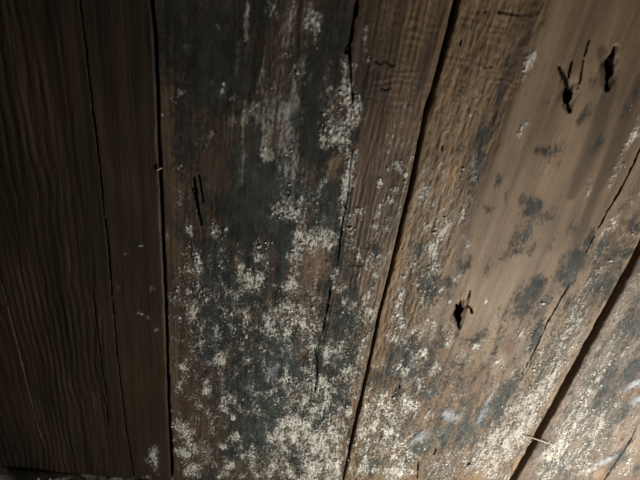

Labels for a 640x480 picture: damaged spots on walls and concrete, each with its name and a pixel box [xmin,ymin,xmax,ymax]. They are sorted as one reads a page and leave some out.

crack [344,0,359,121]
crack [78,0,134,478]
crack [341,149,353,228]
water stain [155,0,640,480]
crack [586,148,640,253]
crack [522,289,567,374]